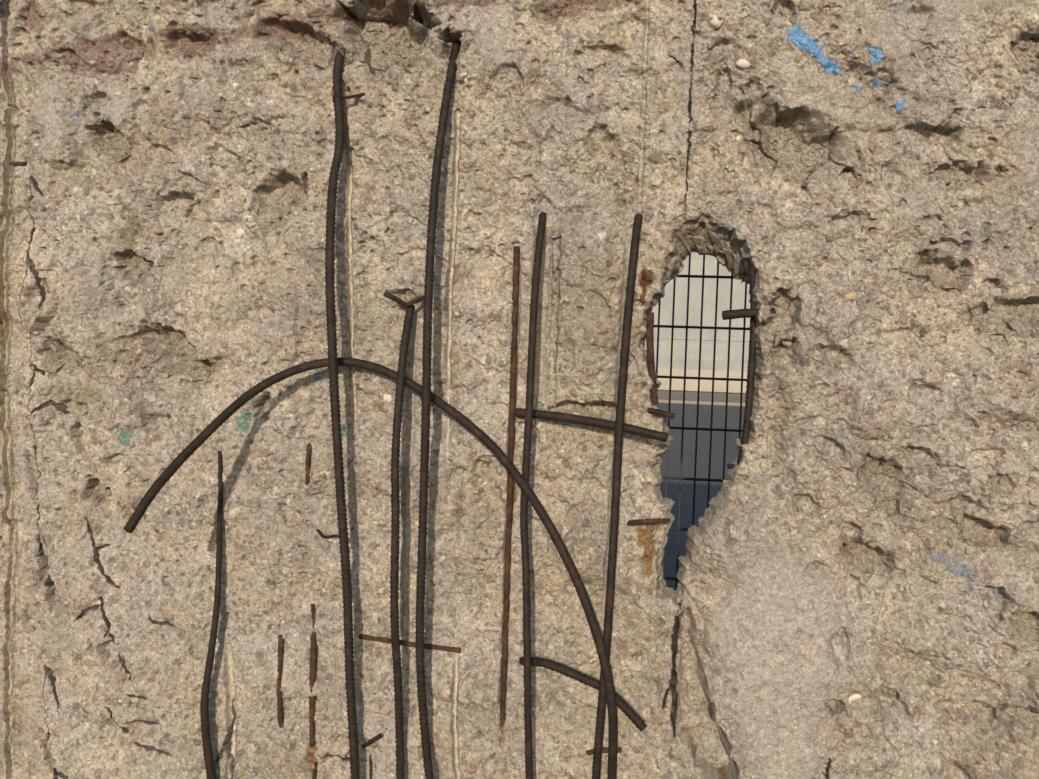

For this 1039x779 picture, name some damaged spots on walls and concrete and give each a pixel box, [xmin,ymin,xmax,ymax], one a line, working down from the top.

crack [671,0,697,206]
spalling [237,165,308,238]
rust [639,269,652,305]
crack [19,158,69,538]
spalling [138,315,222,386]
spalling [235,393,274,433]
spalling [987,472,1018,499]
crack [44,576,56,594]
rust [635,524,658,578]
crack [74,520,174,757]
crack [662,602,681,738]
rust [305,743,318,777]